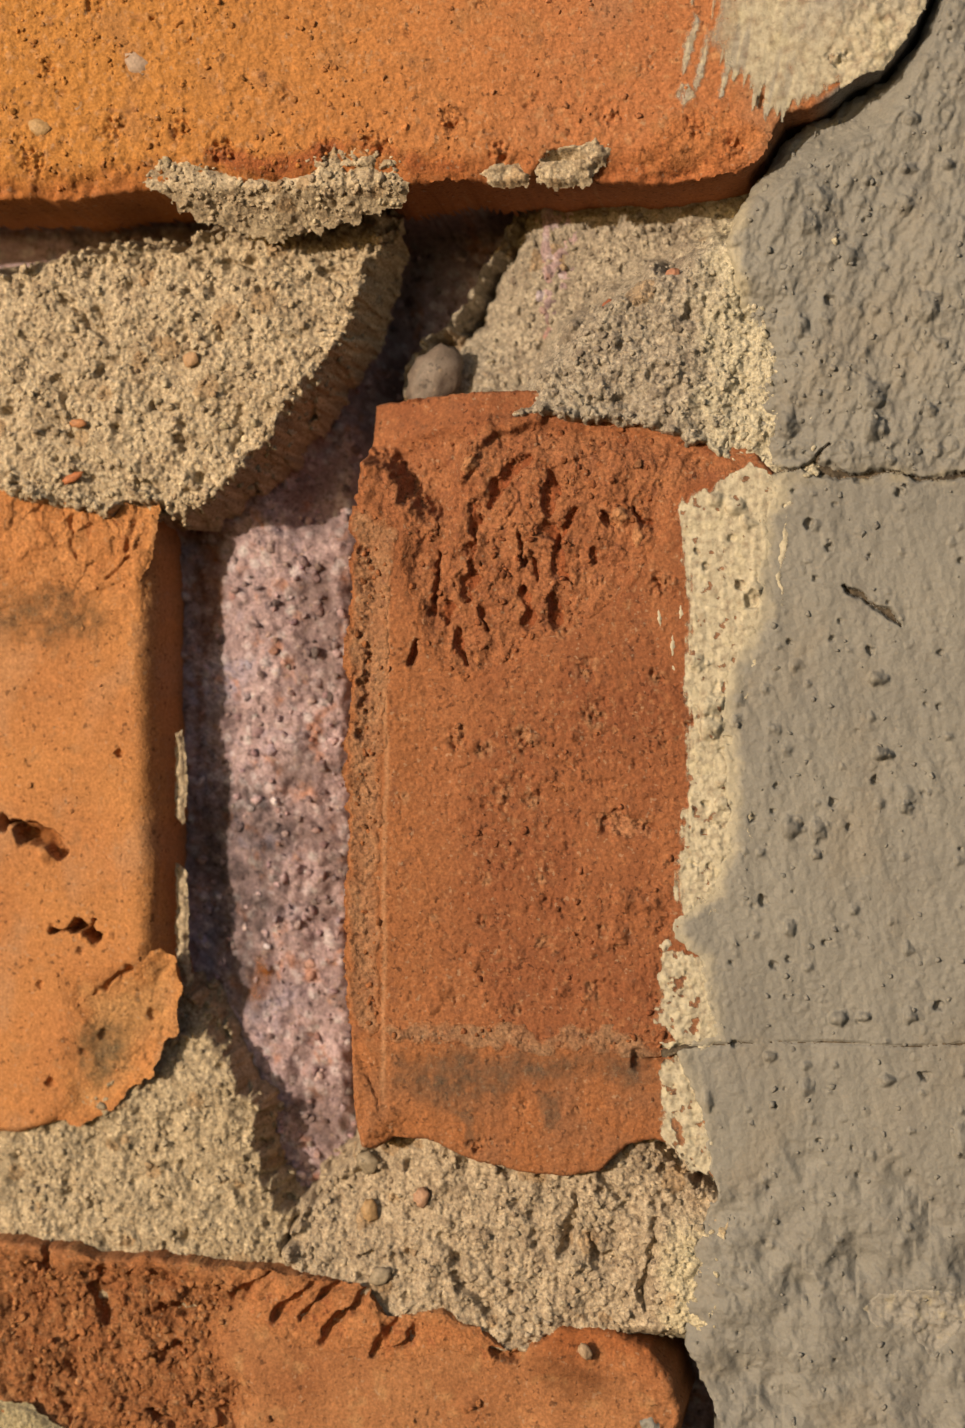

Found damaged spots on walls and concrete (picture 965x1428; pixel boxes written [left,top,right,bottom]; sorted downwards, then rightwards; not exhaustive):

spalling [202,136,469,184]
peeling [629,0,926,181]
crack [777,443,965,482]
spalling [0,490,161,630]
spalling [341,417,792,1037]
spalling [5,817,70,861]
spalling [50,918,103,943]
spalling [57,948,183,1127]
crack [383,1020,965,1058]
peeling [653,939,722,1180]
spalling [0,1245,509,1428]
peeling [863,1289,965,1355]